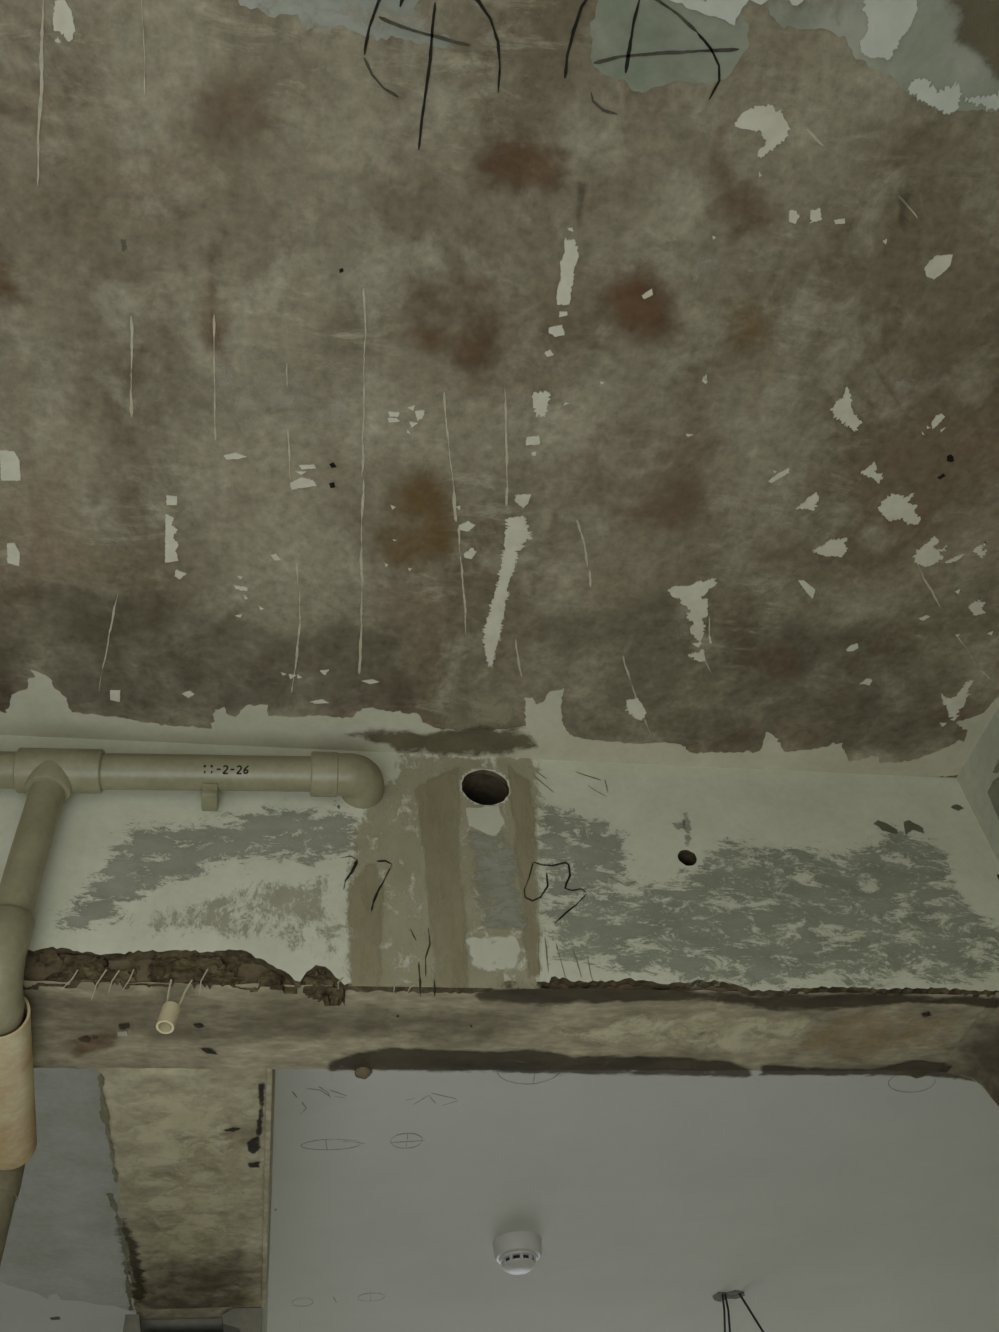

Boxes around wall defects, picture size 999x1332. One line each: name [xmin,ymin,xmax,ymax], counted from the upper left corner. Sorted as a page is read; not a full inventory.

peeling [53,0,76,44]
flaking render [0,670,999,777]
spalling [23,949,345,1006]
leakage [565,1011,935,1054]
leakage [117,1092,236,1255]